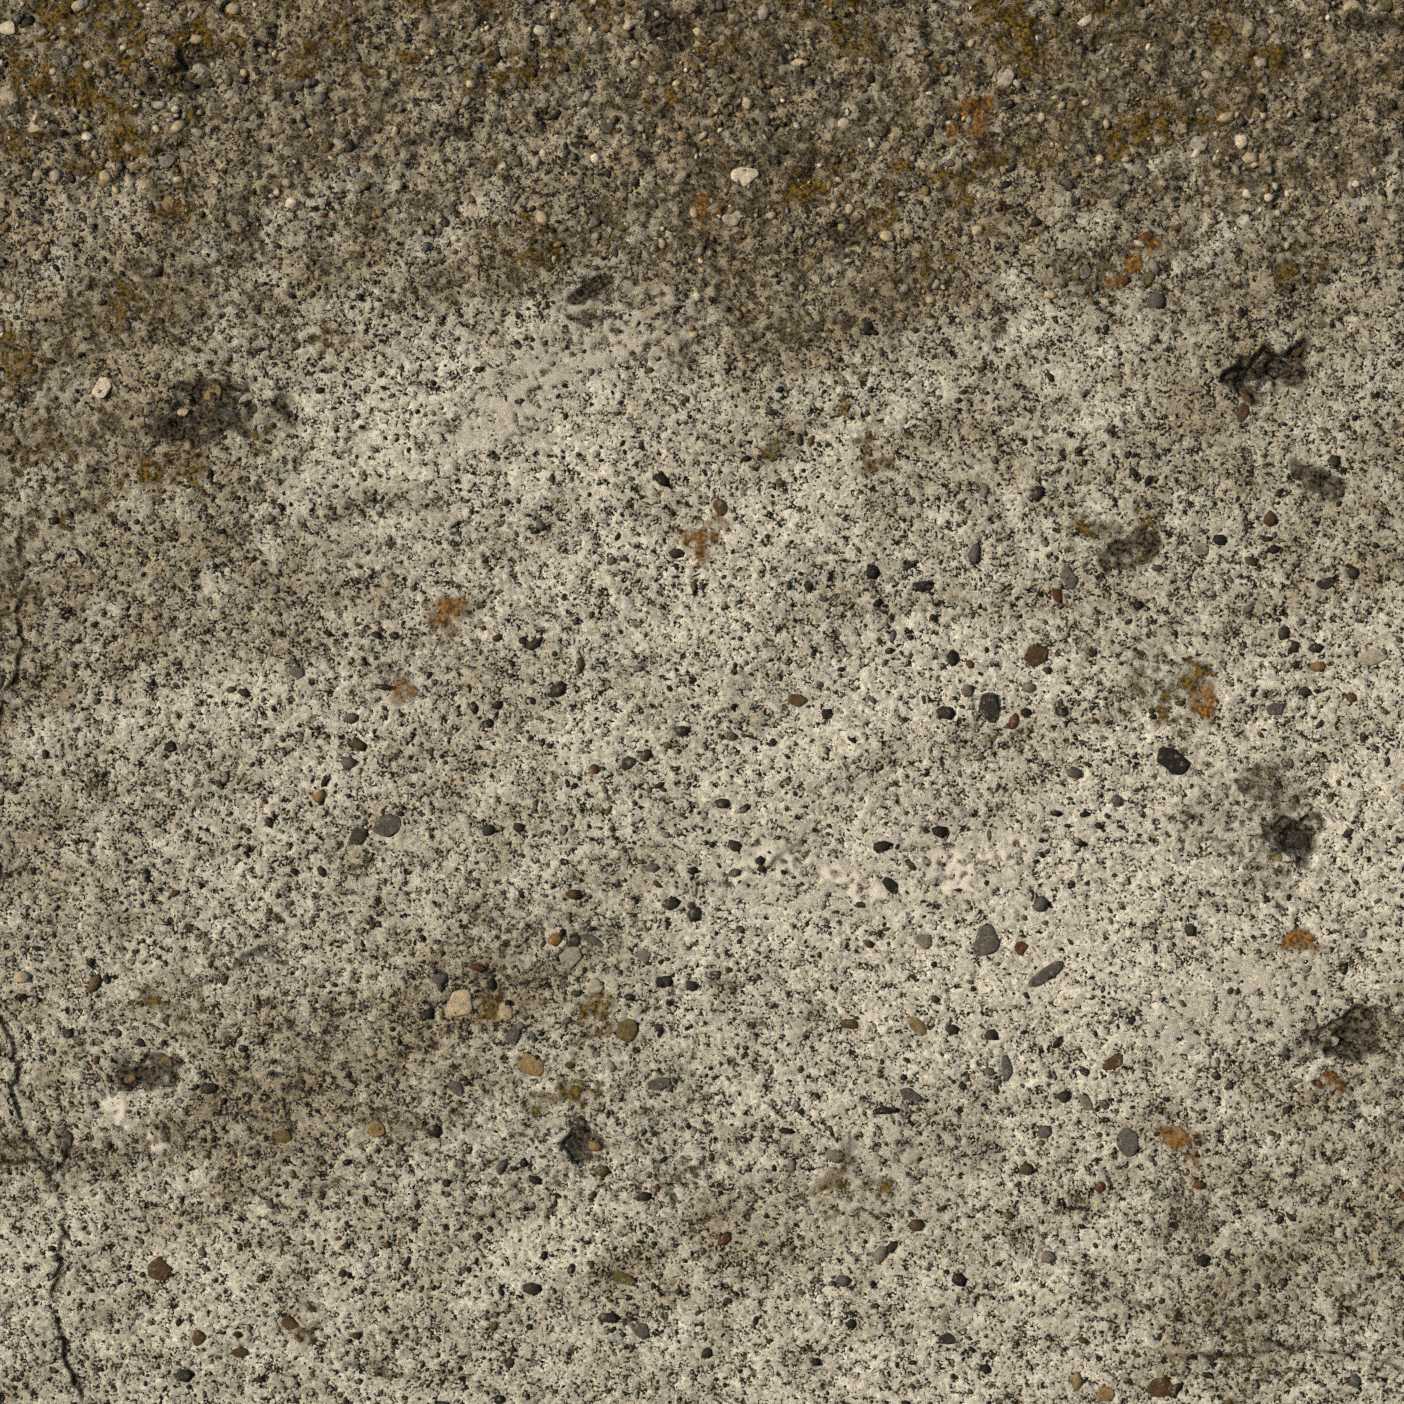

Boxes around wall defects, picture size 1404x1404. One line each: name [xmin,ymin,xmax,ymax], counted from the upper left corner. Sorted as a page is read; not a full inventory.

crack [0,516,26,717]
crack [0,1014,69,1174]
crack [50,1210,84,1401]